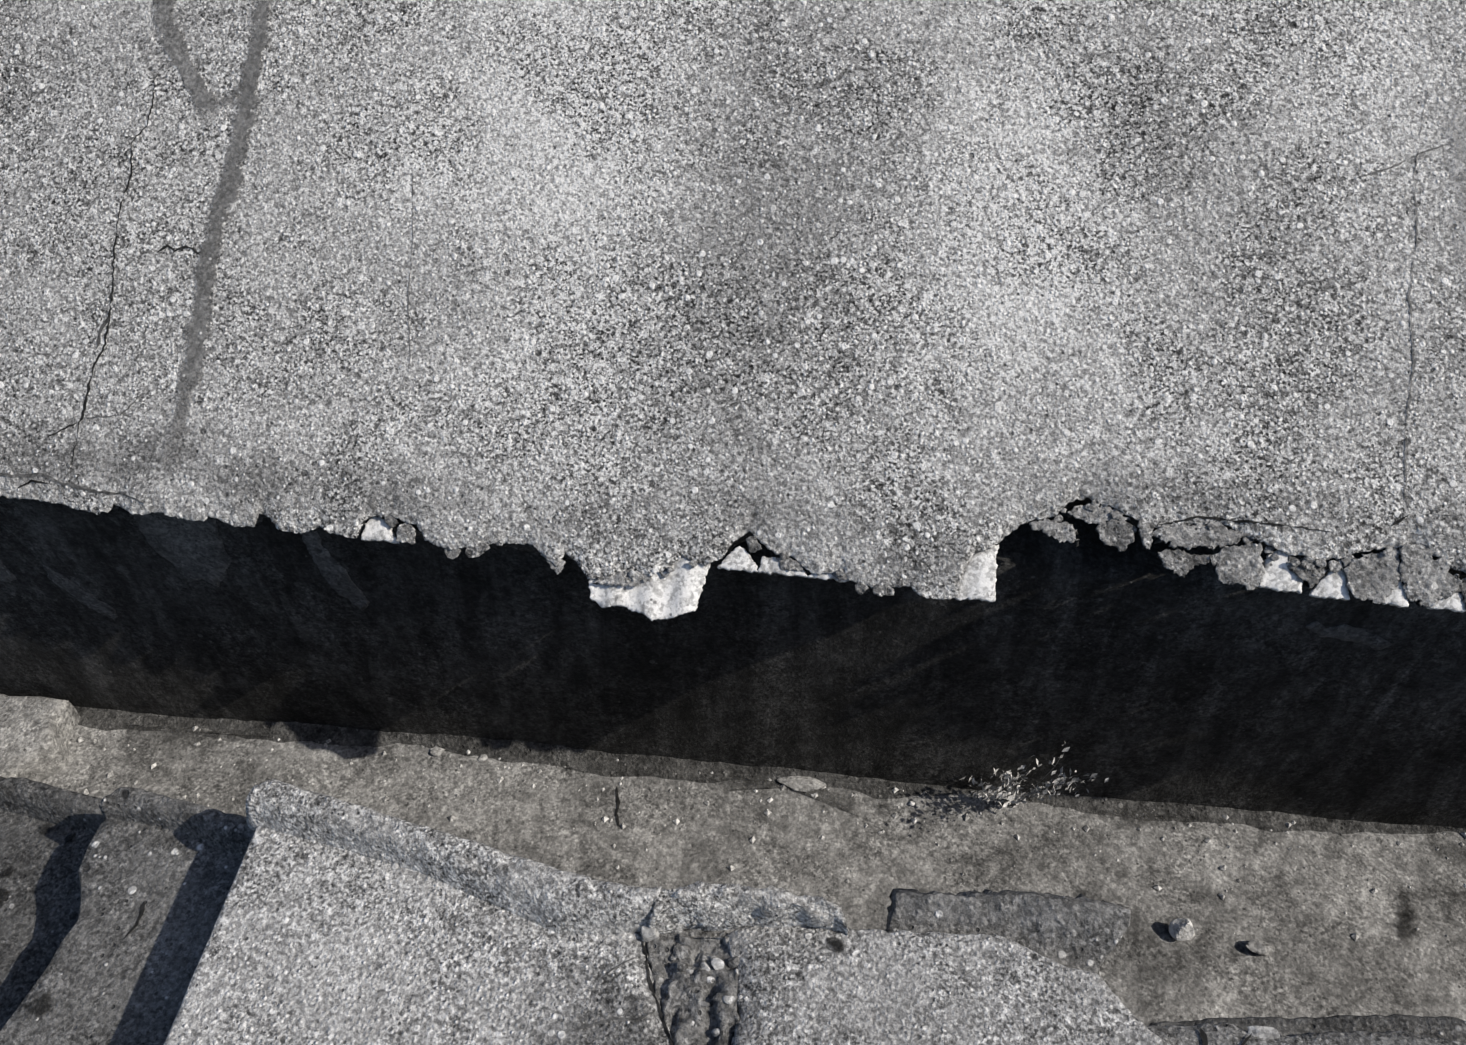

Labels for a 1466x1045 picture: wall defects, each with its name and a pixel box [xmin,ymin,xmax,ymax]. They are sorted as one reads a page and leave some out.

water stain [153,0,270,408]
crack [0,61,166,503]
crack [158,244,200,254]
peeling [133,512,232,587]
peeling [300,531,370,610]
spalling [361,515,418,545]
spalling [444,542,503,559]
spalling [541,554,566,575]
spalling [588,536,895,621]
spalling [955,545,999,602]
spalling [1029,499,1466,613]
crack [1200,1028,1252,1045]